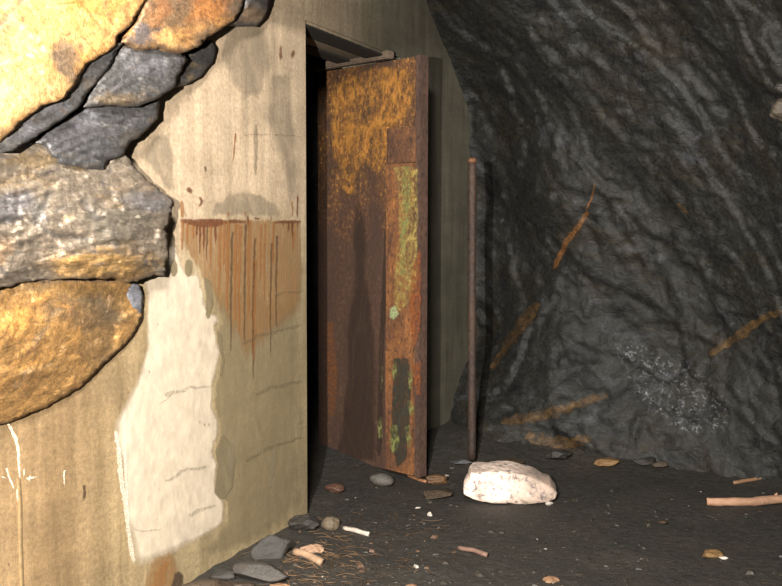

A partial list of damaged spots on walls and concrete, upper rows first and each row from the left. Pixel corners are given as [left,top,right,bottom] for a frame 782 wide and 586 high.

rust [332,68,412,194]